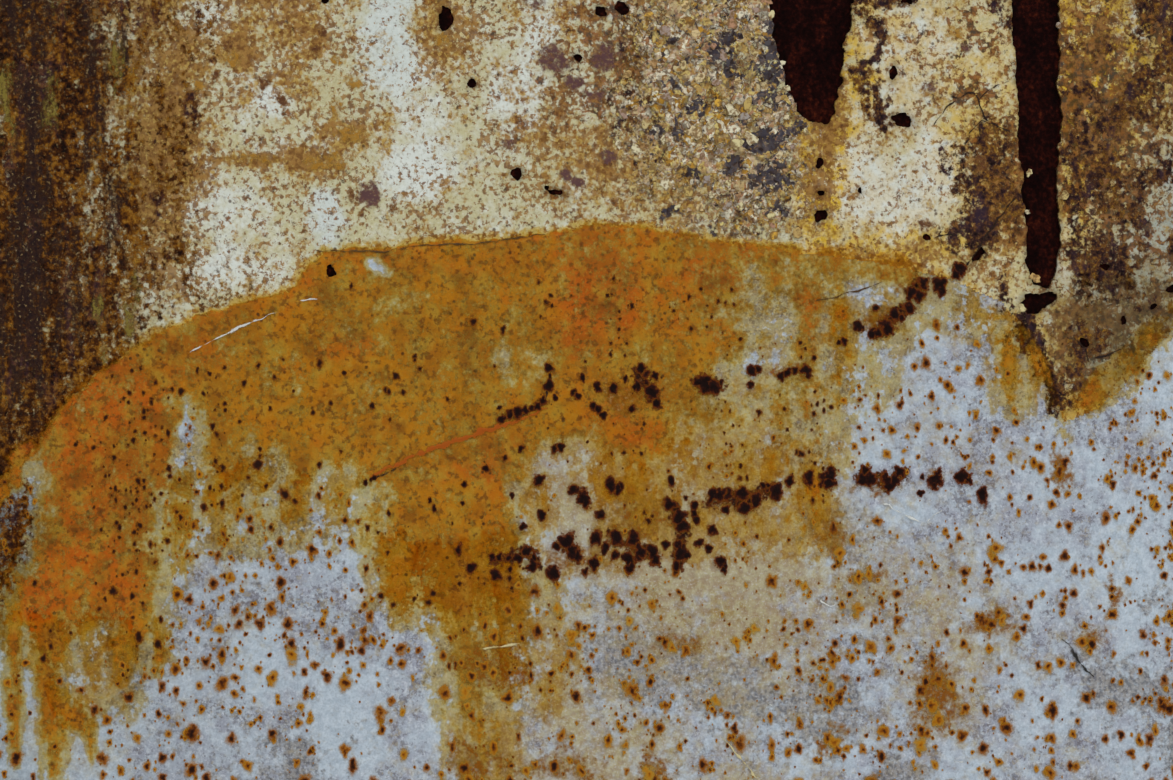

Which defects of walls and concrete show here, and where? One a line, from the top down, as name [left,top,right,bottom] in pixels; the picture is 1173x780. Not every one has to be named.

rust [995,0,1173,429]
rust [0,0,921,780]
rust [893,349,985,414]
rust [936,520,969,555]
rust [916,400,995,509]
rust [1002,487,1033,517]
rust [983,533,1052,586]
rust [1007,436,1082,533]
rust [1089,361,1173,580]
rust [716,587,1080,780]
rust [1125,598,1173,707]
rust [1126,714,1173,776]